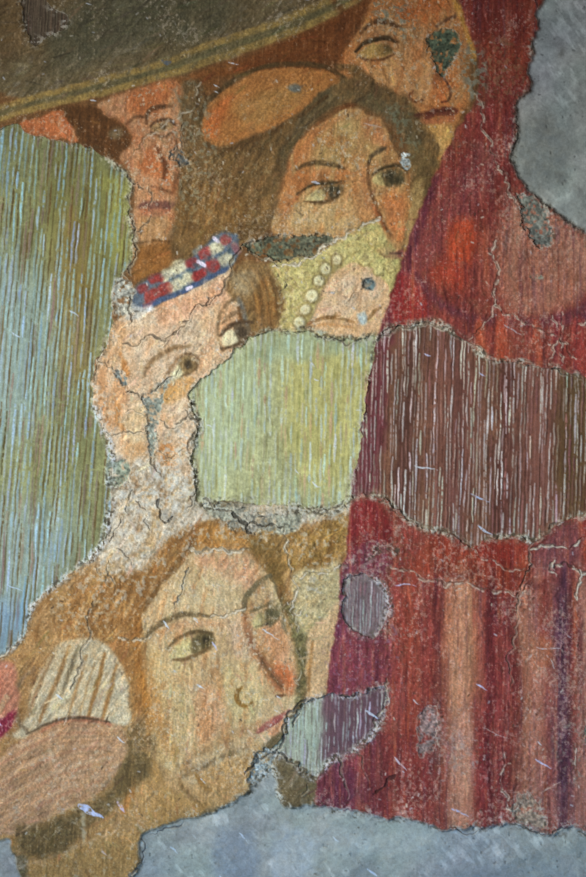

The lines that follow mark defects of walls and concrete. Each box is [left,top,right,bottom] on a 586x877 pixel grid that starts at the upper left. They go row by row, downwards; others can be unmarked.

spalling [426,27,462,77]
crack [134,83,200,166]
spalling [510,0,586,249]
crack [116,175,380,348]
crack [388,239,586,376]
crack [106,391,140,437]
crack [151,410,203,474]
spalling [203,501,303,536]
crack [389,522,586,685]
spalling [134,753,586,877]
spalling [0,839,21,877]